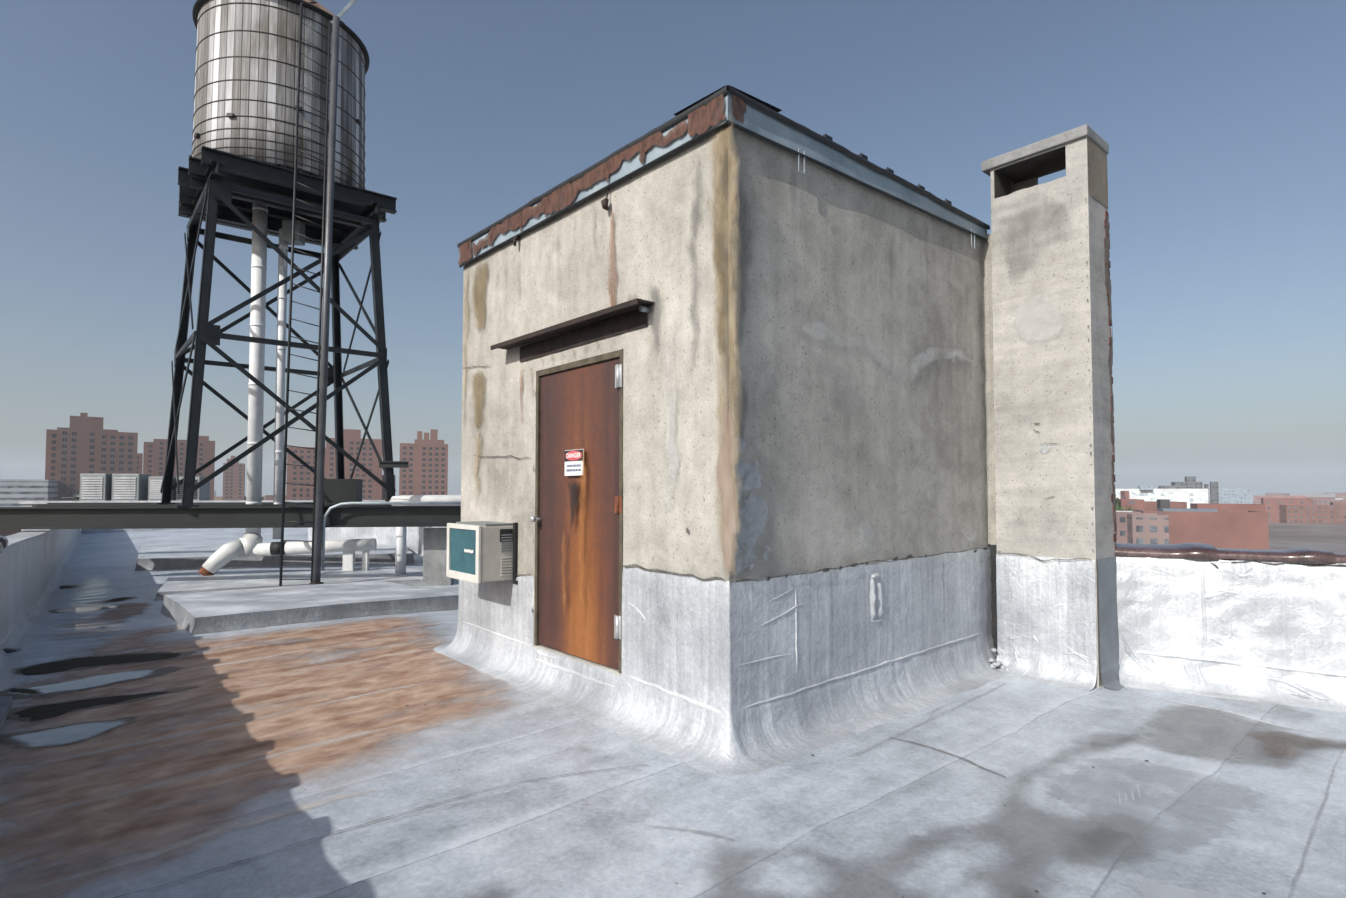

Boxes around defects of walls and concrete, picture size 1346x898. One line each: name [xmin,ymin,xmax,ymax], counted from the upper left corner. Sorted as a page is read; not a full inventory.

rust [458,94,746,571]
peeling [734,438,769,575]
flaking render [1104,211,1117,550]
damp [1256,733,1324,757]